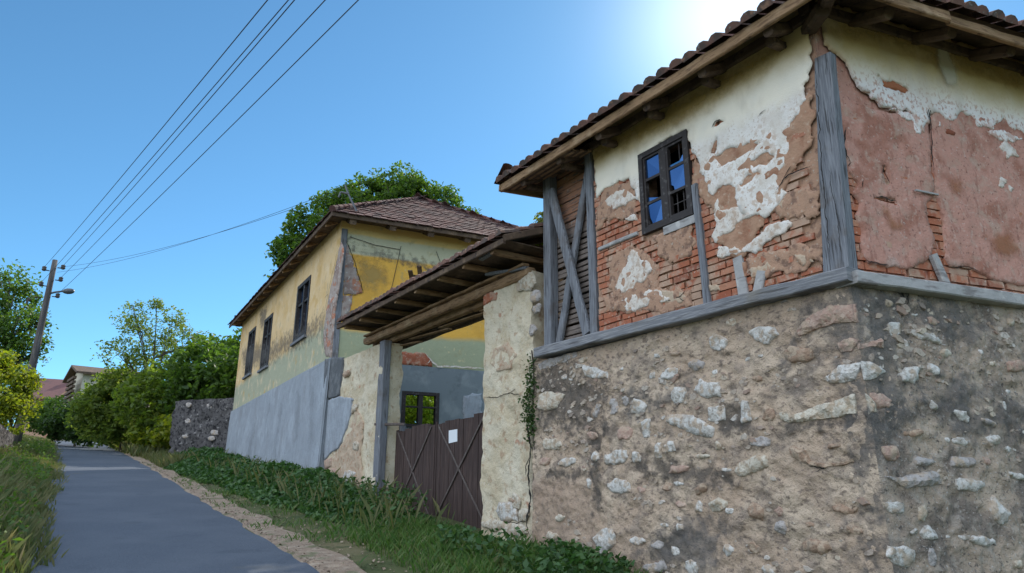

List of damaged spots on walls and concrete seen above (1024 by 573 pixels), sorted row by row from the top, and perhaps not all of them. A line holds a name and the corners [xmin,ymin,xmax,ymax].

crack [927,109,935,166]
flaking render [323,242,363,357]
flaking render [326,408,364,488]
crack [508,419,532,533]